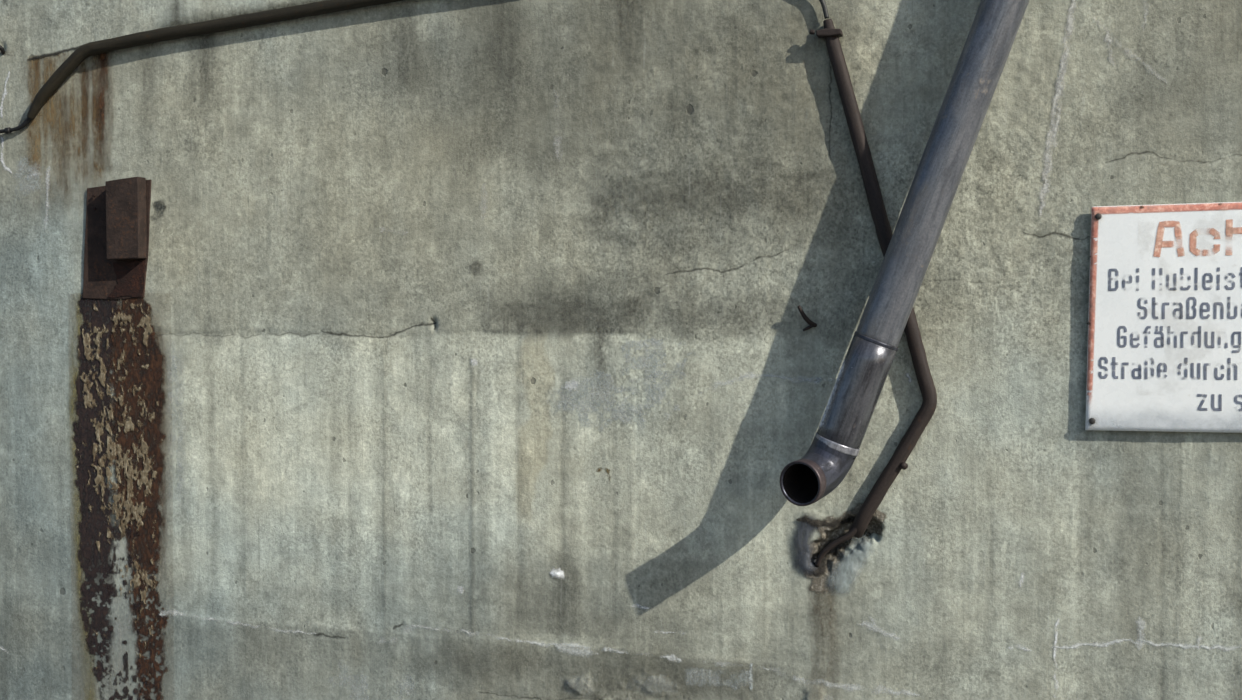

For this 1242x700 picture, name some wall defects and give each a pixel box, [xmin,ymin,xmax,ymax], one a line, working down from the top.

rust [27,46,109,177]
crack [327,318,436,338]
rust [70,260,168,700]